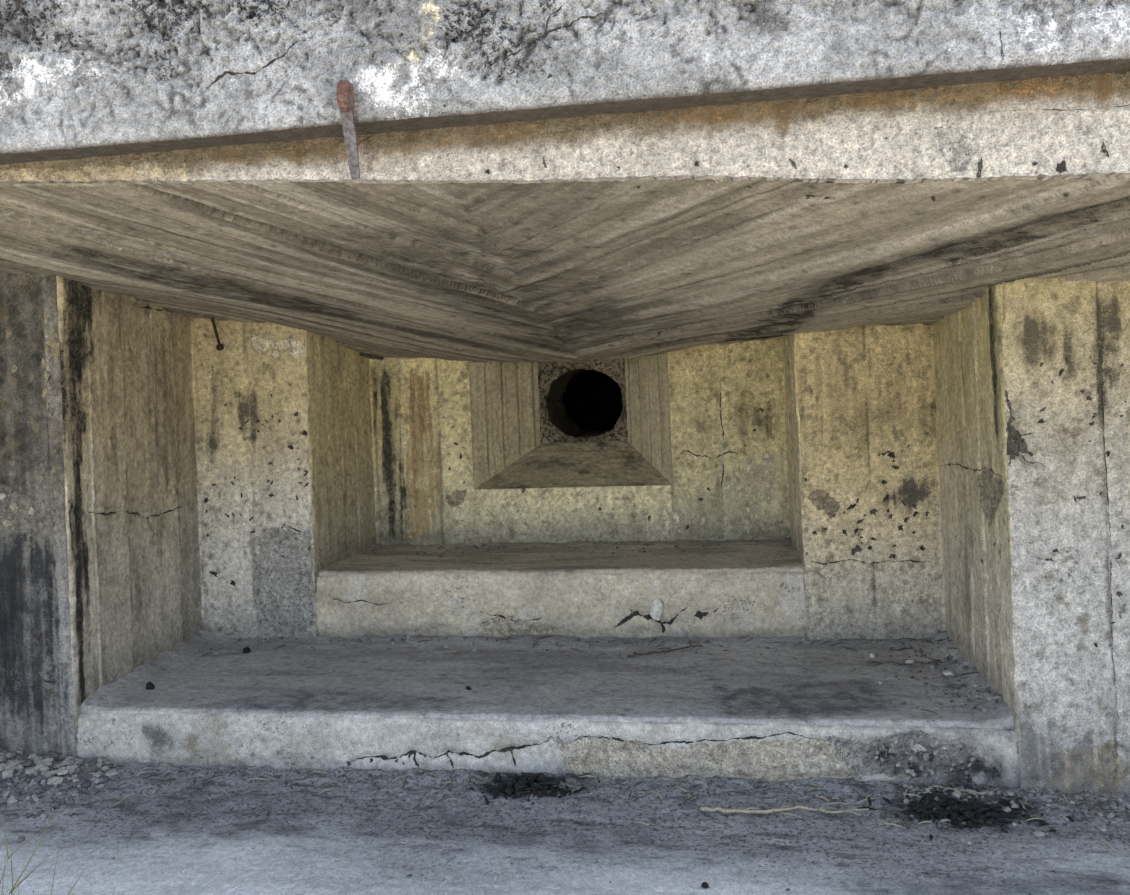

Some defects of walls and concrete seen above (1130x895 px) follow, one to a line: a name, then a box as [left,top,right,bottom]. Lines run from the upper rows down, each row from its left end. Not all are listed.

leakage [0,278,101,732]
crack [614,607,719,633]
crack [354,732,831,768]